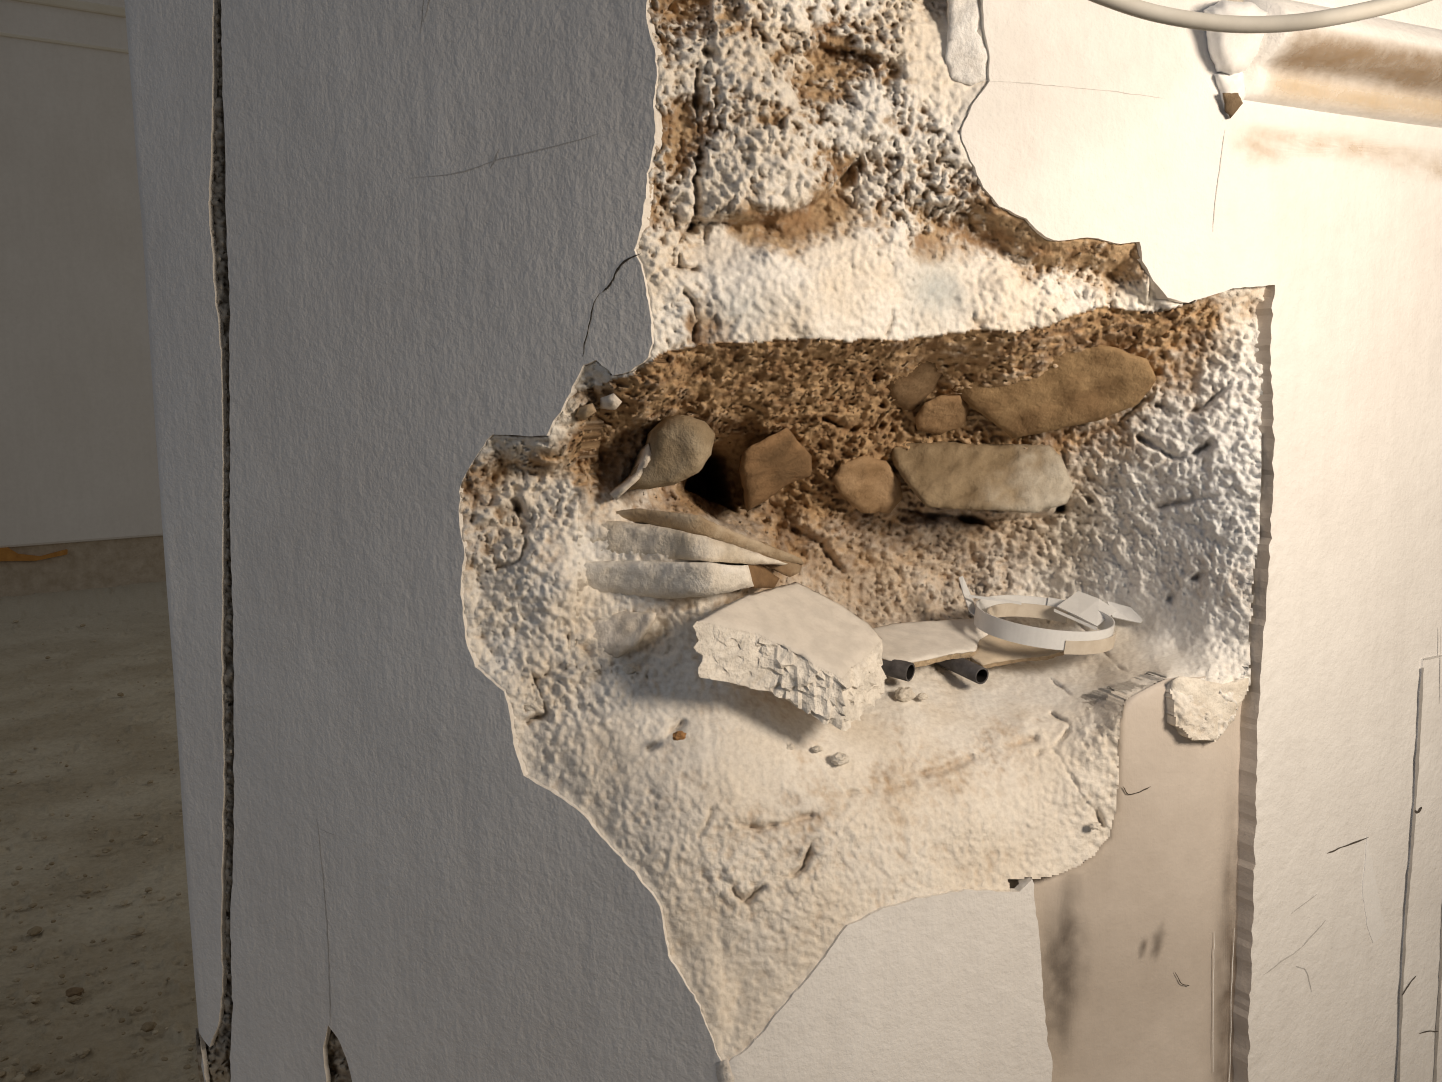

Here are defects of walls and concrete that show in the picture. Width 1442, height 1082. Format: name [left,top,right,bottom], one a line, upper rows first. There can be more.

crack [414,133,599,178]
crack [582,254,640,357]
crack [196,0,235,1082]
spalling [460,0,1266,1082]
crack [316,819,352,1082]